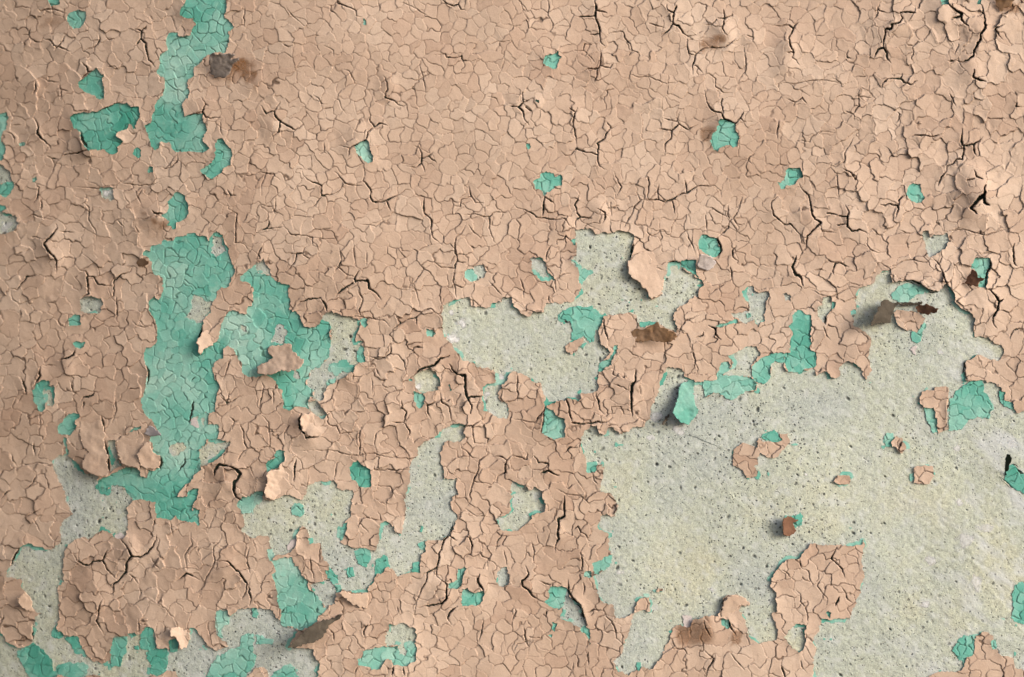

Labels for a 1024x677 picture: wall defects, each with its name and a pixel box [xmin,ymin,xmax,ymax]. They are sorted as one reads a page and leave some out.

peeling [70,0,239,179]
crack [950,6,999,81]
crack [939,135,989,213]
crack [773,191,860,281]
spalling [922,230,949,257]
peeling [962,257,991,288]
crack [985,228,1018,334]
spalling [426,228,720,440]
peeling [0,192,465,677]
crack [359,346,480,449]
spalling [581,269,1024,677]
crack [421,516,506,619]